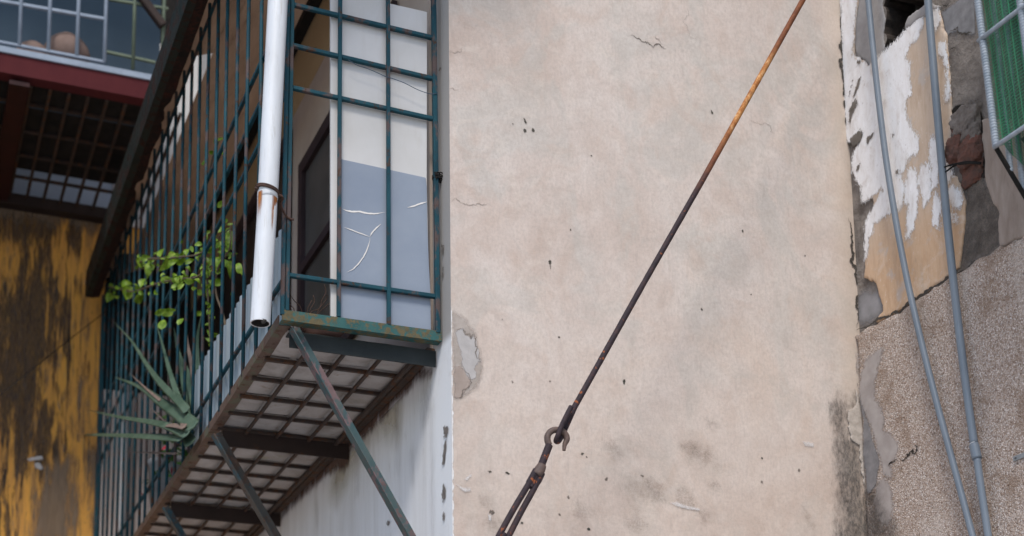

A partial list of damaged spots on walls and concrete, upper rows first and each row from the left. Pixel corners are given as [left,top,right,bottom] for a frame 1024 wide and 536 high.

peeling [840,0,999,263]
water stain [0,208,100,536]
spalling [452,314,482,398]
spalling [847,390,866,492]
water stain [831,403,893,536]